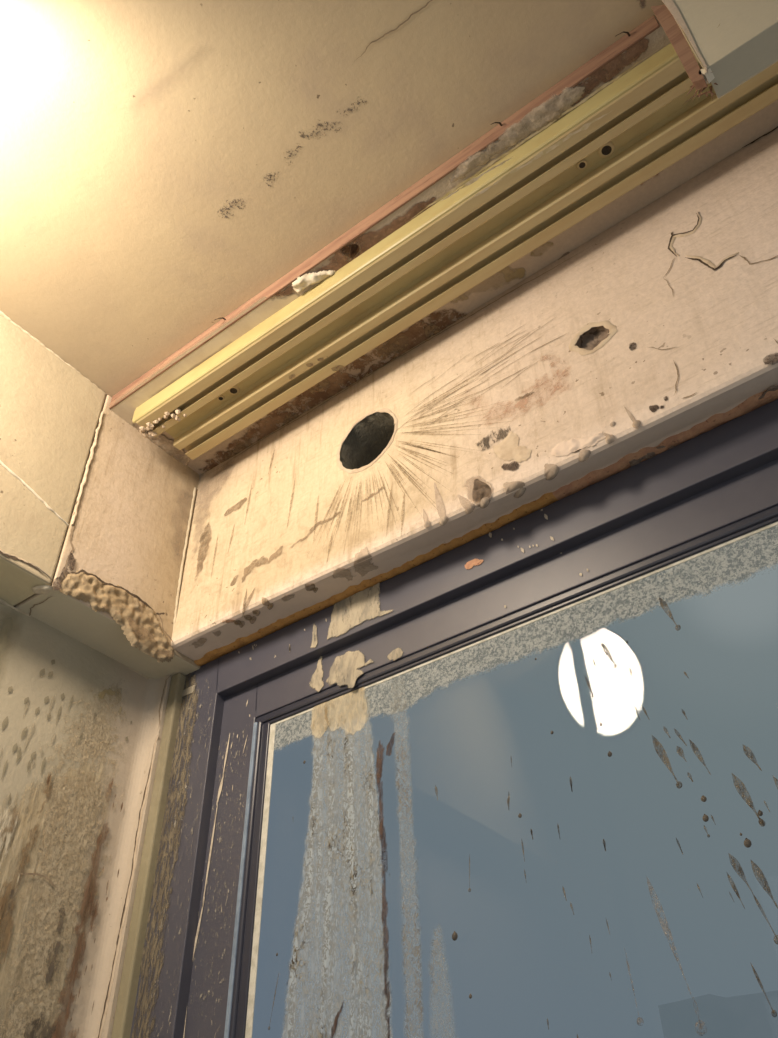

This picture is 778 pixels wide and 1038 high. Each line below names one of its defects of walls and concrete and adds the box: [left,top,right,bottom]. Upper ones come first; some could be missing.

crack [357,0,432,59]
leakage [285,100,367,166]
crack [663,212,778,293]
spalling [569,320,617,355]
spalling [501,461,519,471]
crack [0,411,104,616]
spalling [60,569,174,663]
rust [51,823,119,1038]